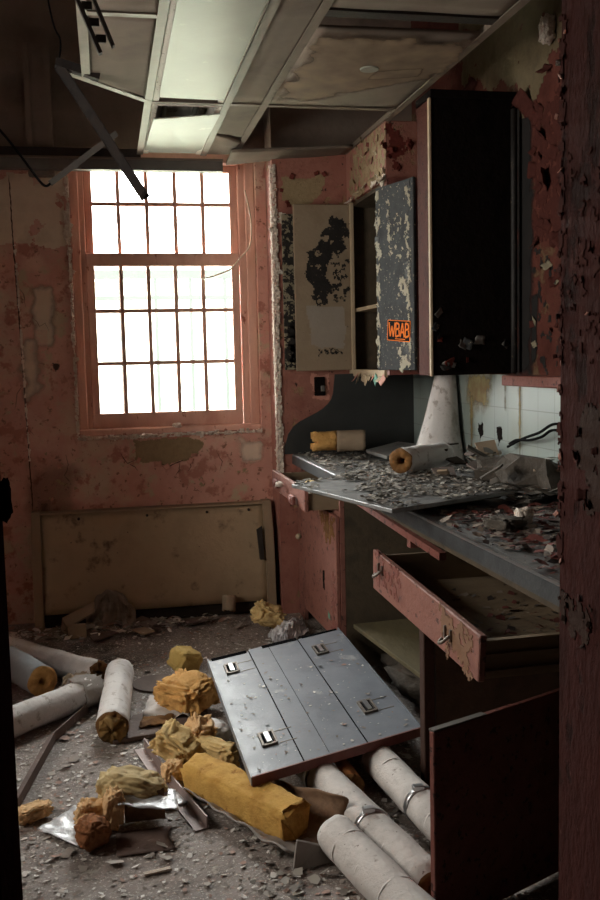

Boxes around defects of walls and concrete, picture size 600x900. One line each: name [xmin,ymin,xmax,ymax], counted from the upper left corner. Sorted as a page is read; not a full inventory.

peeling [0,171,263,473]
spalling [268,163,330,473]
water stain [276,36,467,101]
peeling [345,123,415,206]
peeling [459,0,600,375]